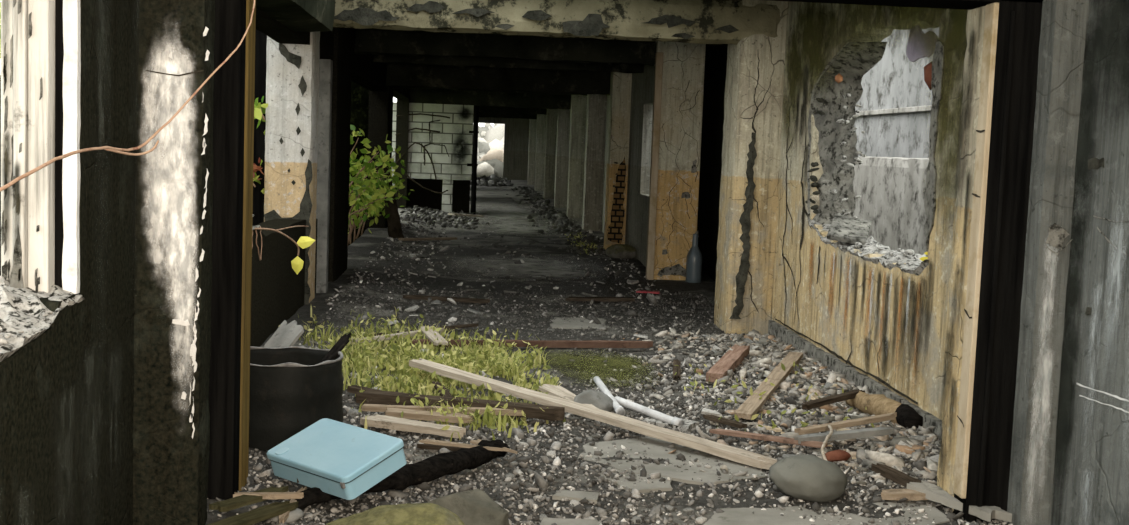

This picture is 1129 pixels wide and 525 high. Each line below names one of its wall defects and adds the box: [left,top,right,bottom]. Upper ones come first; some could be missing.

spalling [0,35,84,362]
water stain [57,349,119,512]
water stain [136,0,195,376]
peeling [252,148,313,305]
peeling [279,43,307,135]
peeling [334,1,610,37]
crack [656,80,699,266]
crack [729,57,918,405]
spalling [805,41,945,276]
water stain [824,254,932,377]
water stain [784,4,975,252]
water stain [940,268,963,469]